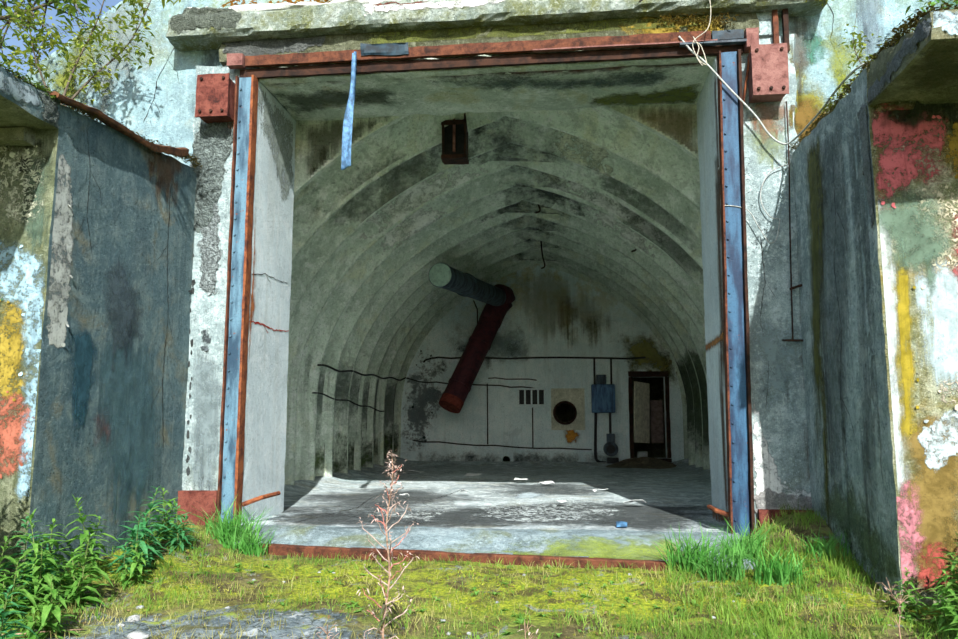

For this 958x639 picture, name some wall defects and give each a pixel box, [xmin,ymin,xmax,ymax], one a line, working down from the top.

corrosion [148,148,181,200]
water stain [307,122,373,178]
peeling [857,11,958,471]
peeling [0,145,74,499]
crack [249,321,289,332]